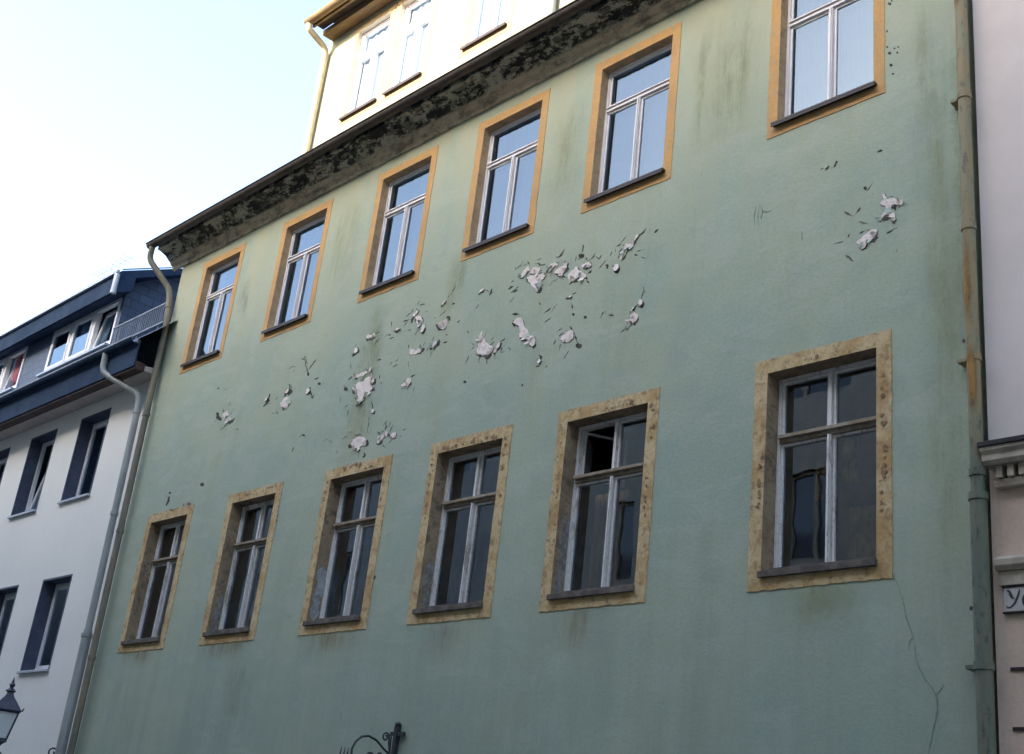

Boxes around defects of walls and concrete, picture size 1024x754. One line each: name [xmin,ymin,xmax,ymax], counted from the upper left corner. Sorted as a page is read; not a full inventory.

peeling [834,193,903,261]
peeling [508,229,658,367]
peeling [215,402,238,430]
peeling [263,356,321,414]
peeling [324,287,511,501]
crack [892,572,944,754]